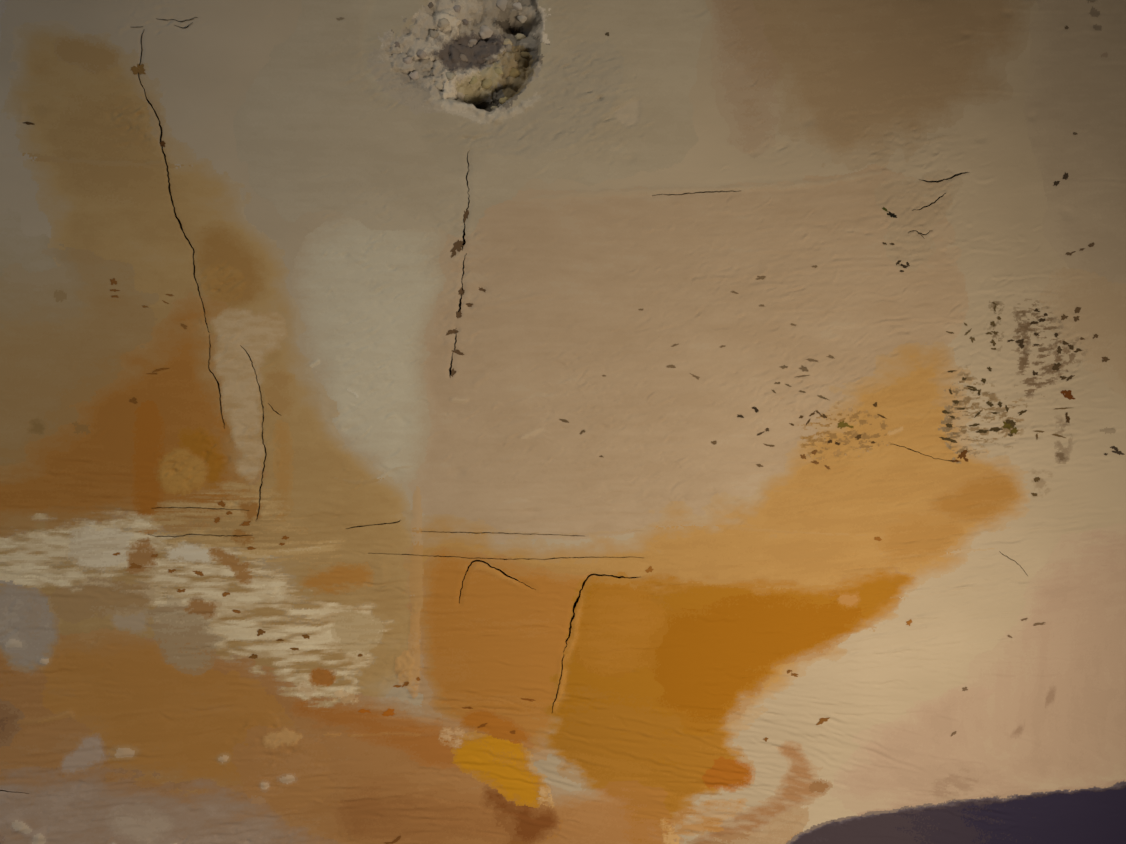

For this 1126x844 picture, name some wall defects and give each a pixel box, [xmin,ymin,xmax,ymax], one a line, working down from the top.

hole [473,99,500,112]
hole [492,17,525,37]
crack [131,17,225,429]
damp [0,20,414,698]
crack [149,345,280,537]
crack [446,154,486,377]
damp [418,0,1126,761]
crack [348,520,641,713]